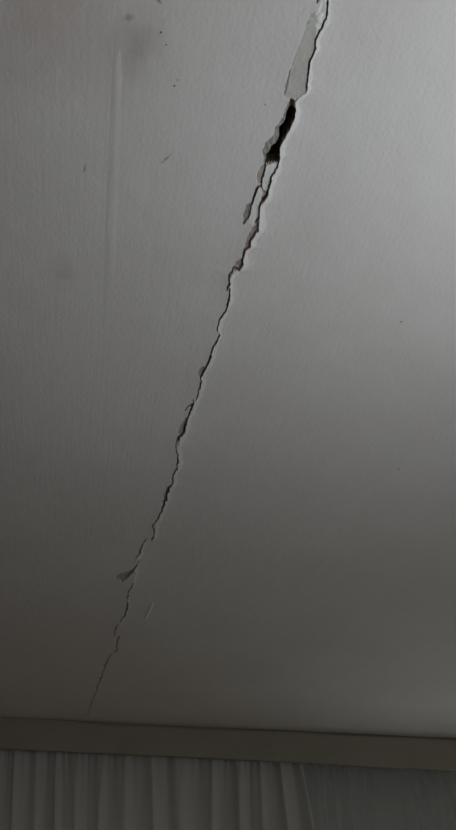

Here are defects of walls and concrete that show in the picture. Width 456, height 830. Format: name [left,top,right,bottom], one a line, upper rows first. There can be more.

crack [87,0,332,717]
peeling [233,0,327,271]